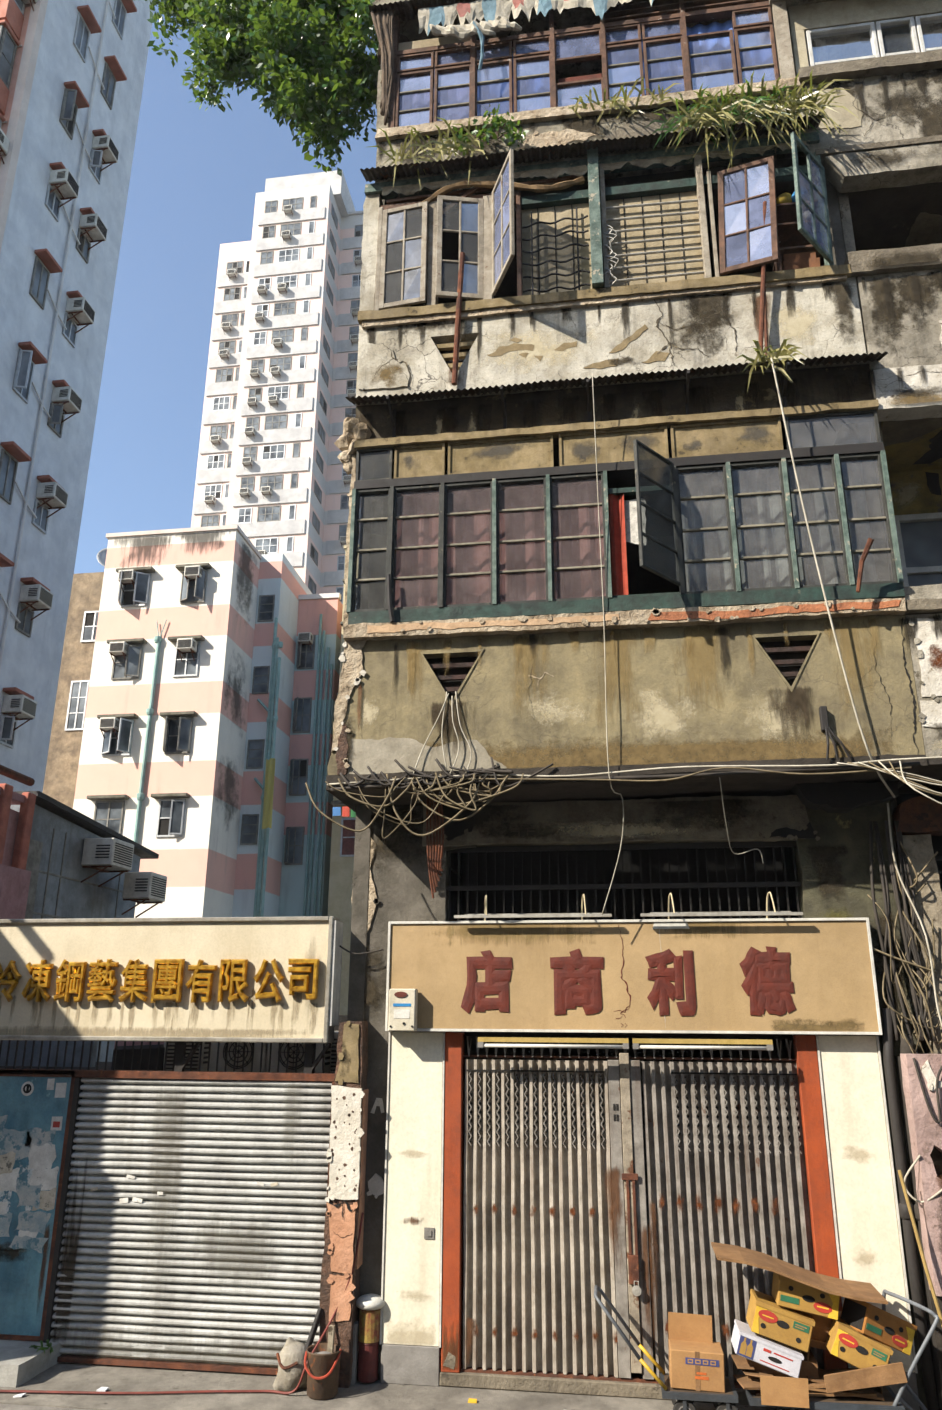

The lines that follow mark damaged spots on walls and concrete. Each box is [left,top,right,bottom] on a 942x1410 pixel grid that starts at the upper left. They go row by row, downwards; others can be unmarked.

leakage [868,68,942,137]
leakage [829,282,854,333]
leakage [867,251,942,349]
crack [375,343,411,382]
flaking render [645,599,901,622]
flaking render [331,614,620,775]
leakage [486,622,888,769]
peeling [909,618,942,728]
rust [930,645,942,669]
peeling [920,1060,942,1092]
rust [473,1168,620,1249]
rust [639,1196,778,1332]